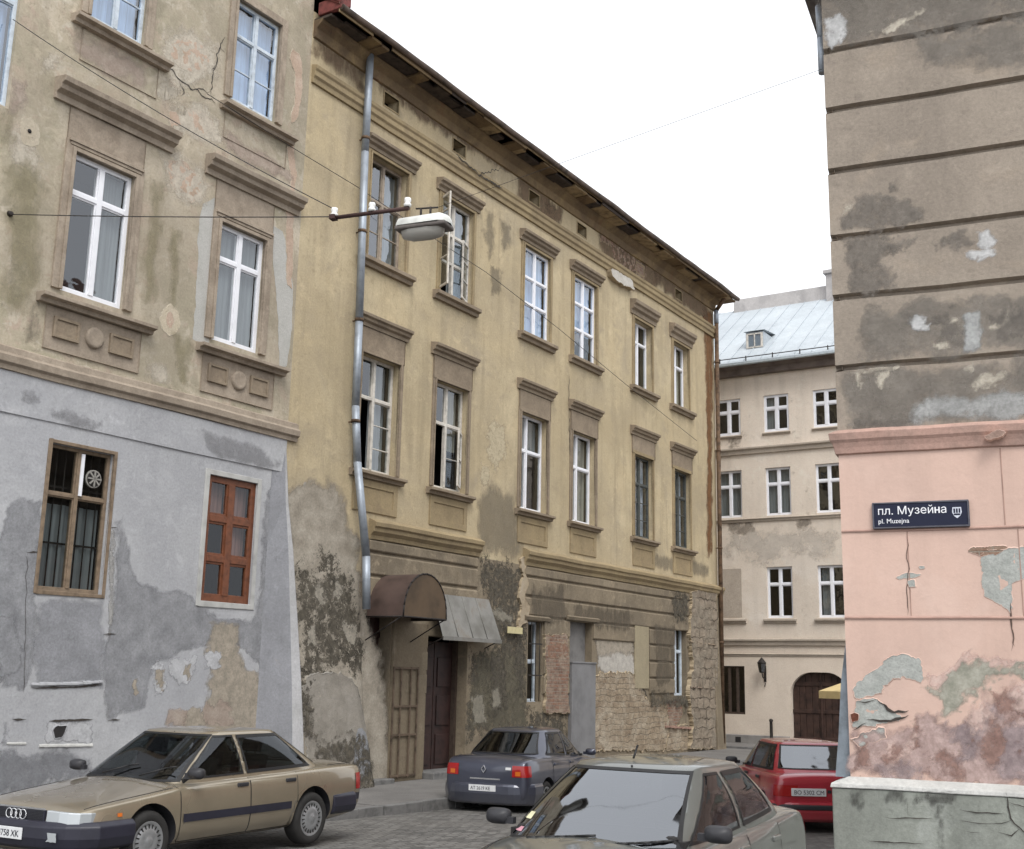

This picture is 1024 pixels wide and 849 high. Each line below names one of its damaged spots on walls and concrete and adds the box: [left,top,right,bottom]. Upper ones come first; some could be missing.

peeling [825,14,846,48]
crack [170,39,224,103]
leakage [912,315,930,330]
leakage [951,312,1008,351]
leakage [856,366,1024,428]
crack [904,539,912,608]
peeling [968,545,1024,614]
flaking render [151,622,259,728]
leakage [295,545,375,789]
leakage [465,554,568,741]
spalling [51,724,68,740]
flaking render [847,653,1024,784]